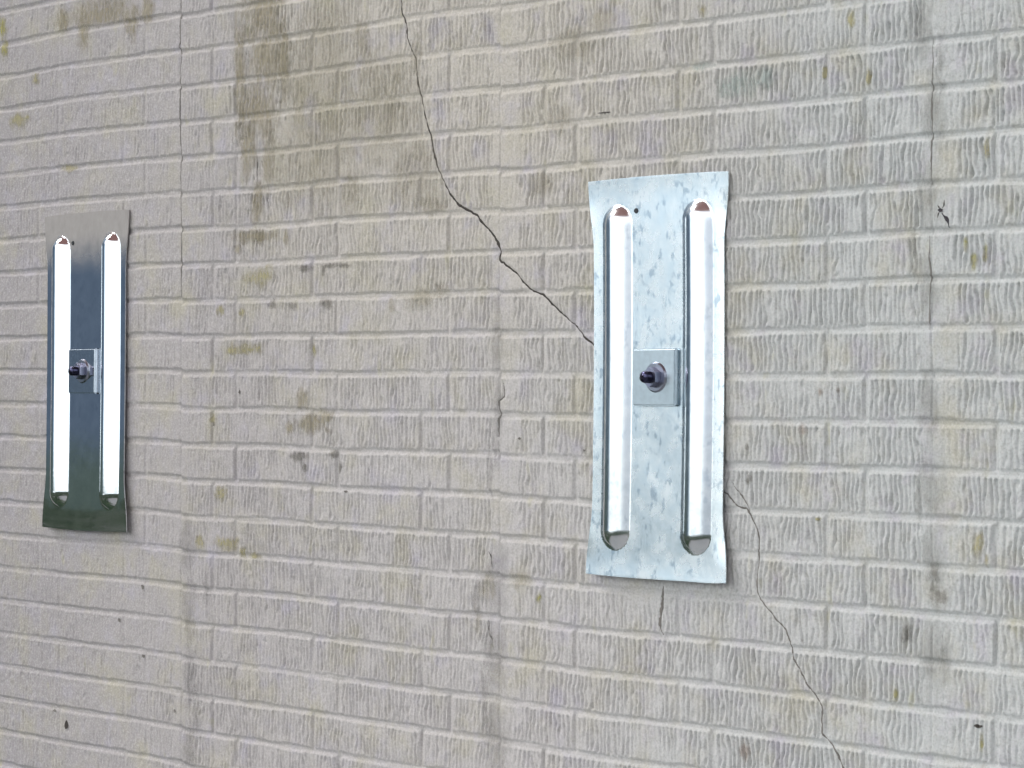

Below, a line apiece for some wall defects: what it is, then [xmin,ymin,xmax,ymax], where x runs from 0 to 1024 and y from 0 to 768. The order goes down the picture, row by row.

water stain [236,0,288,169]
crack [401,0,594,346]
crack [497,383,505,436]
crack [657,586,665,635]
crack [724,482,844,768]